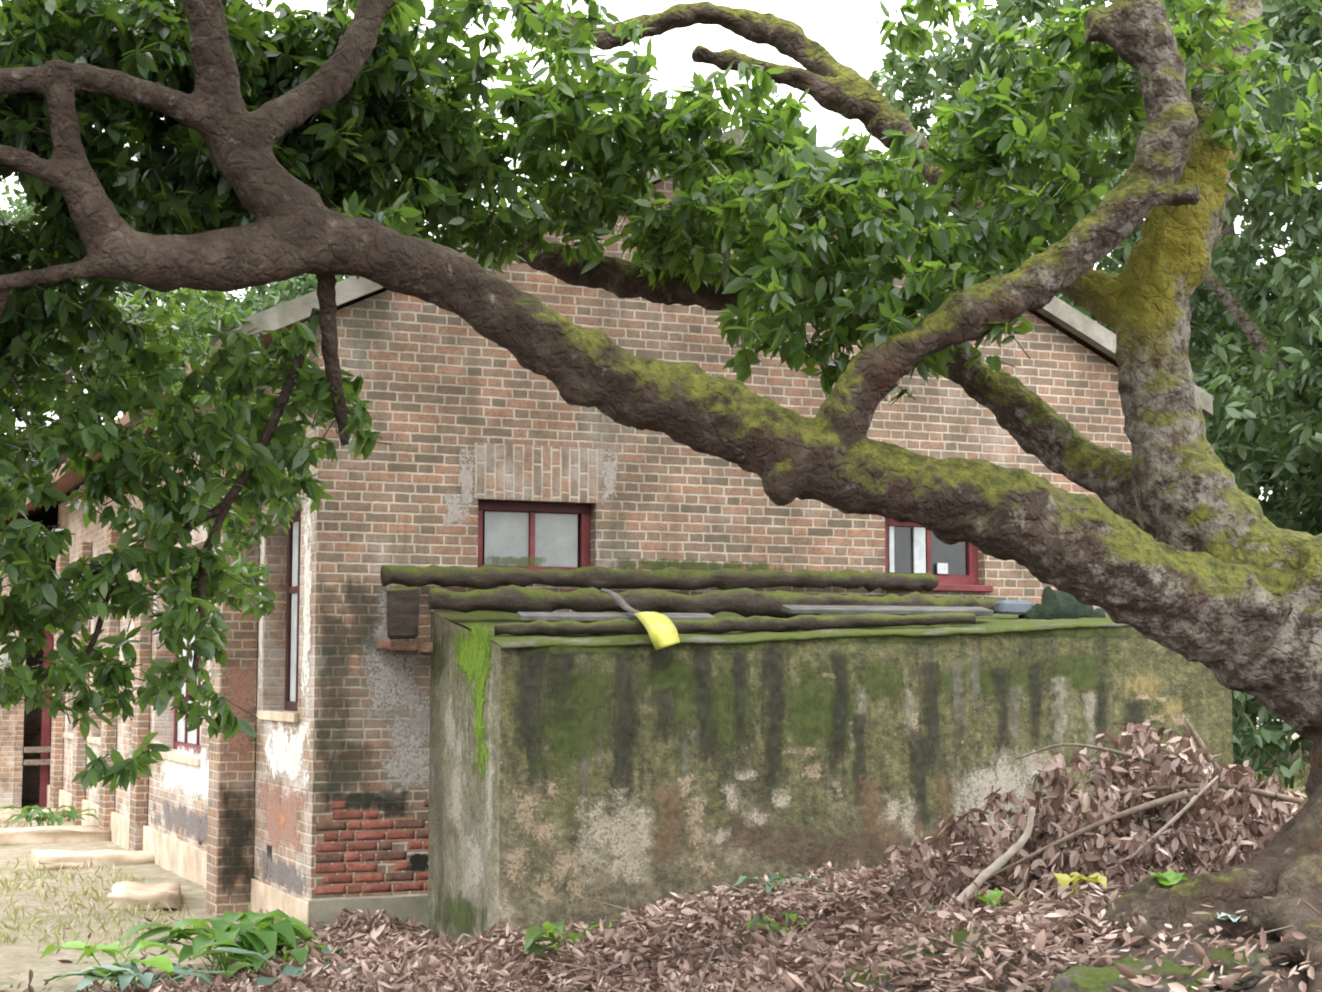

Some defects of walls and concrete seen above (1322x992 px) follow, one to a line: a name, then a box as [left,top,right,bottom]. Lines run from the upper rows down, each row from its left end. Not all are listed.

damp [514,647,574,788]
damp [579,641,638,809]
damp [651,643,716,780]
damp [762,647,785,781]
damp [832,653,866,800]